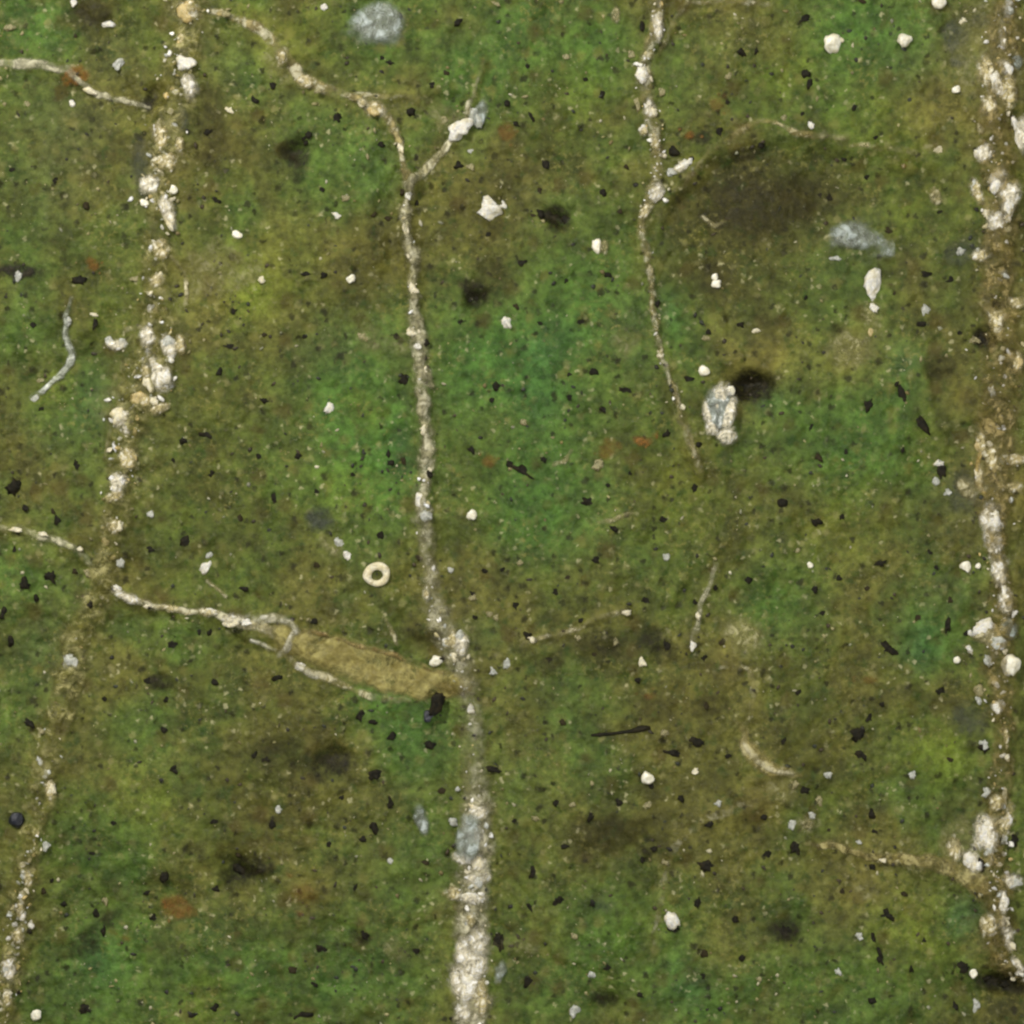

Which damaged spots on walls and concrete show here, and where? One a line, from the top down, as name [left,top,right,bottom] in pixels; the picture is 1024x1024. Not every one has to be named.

leakage [730,369,775,403]
peeling [275,625,471,723]